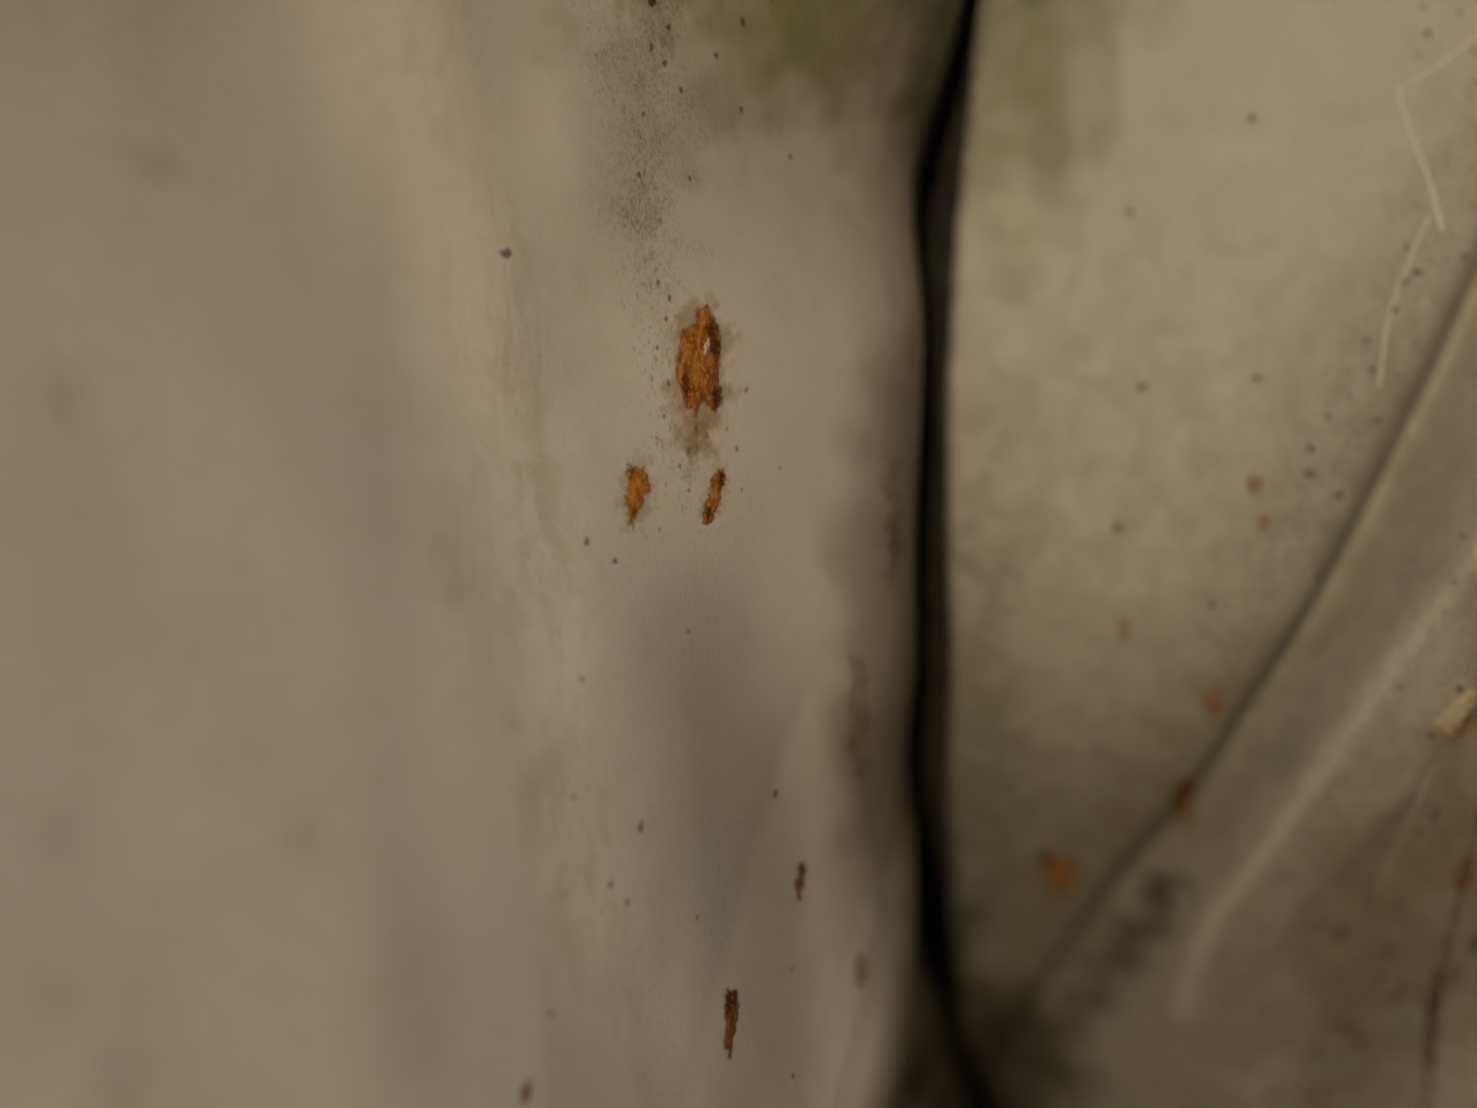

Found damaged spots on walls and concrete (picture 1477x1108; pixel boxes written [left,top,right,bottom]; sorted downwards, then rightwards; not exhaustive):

corrosion [676,305,722,414]
corrosion [625,467,651,527]
corrosion [702,469,725,524]
peeling [1429,686,1477,739]
corrosion [794,862,807,901]
crack [1423,828,1477,1108]
corrosion [724,990,739,1059]